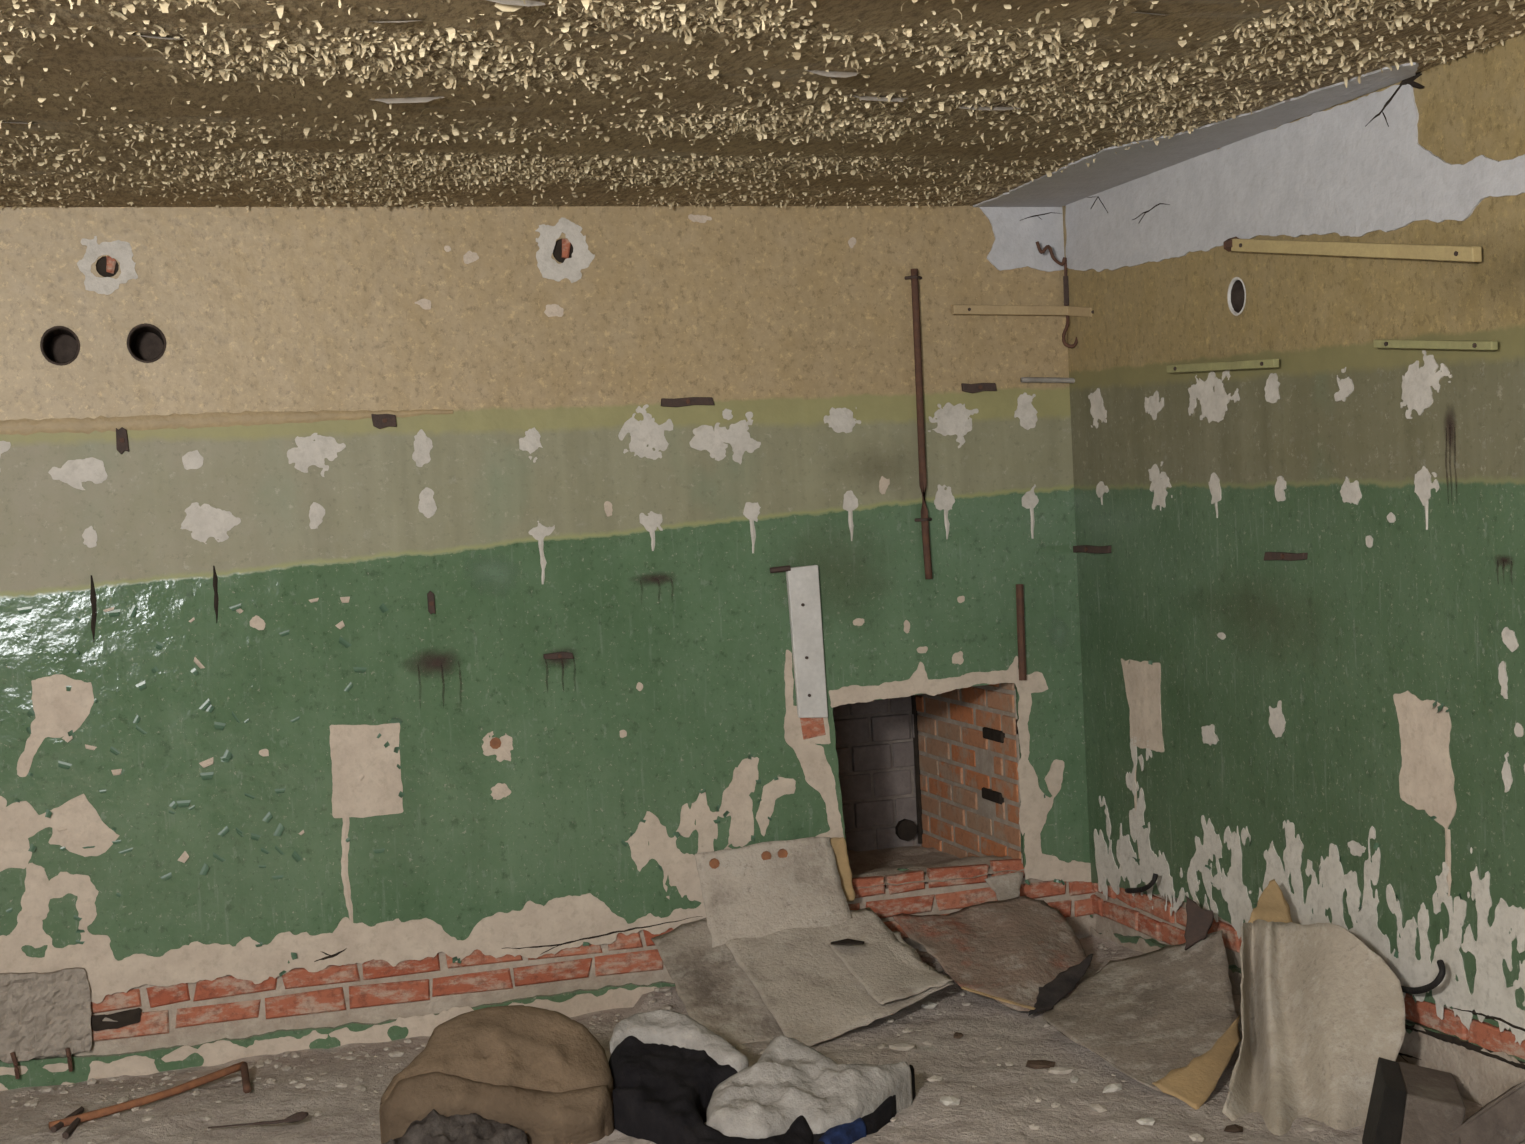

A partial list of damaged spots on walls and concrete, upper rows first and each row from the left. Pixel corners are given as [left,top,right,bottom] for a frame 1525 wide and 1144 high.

peeling [0,0,1525,283]
peeling [0,441,11,472]
peeling [0,620,1525,1106]